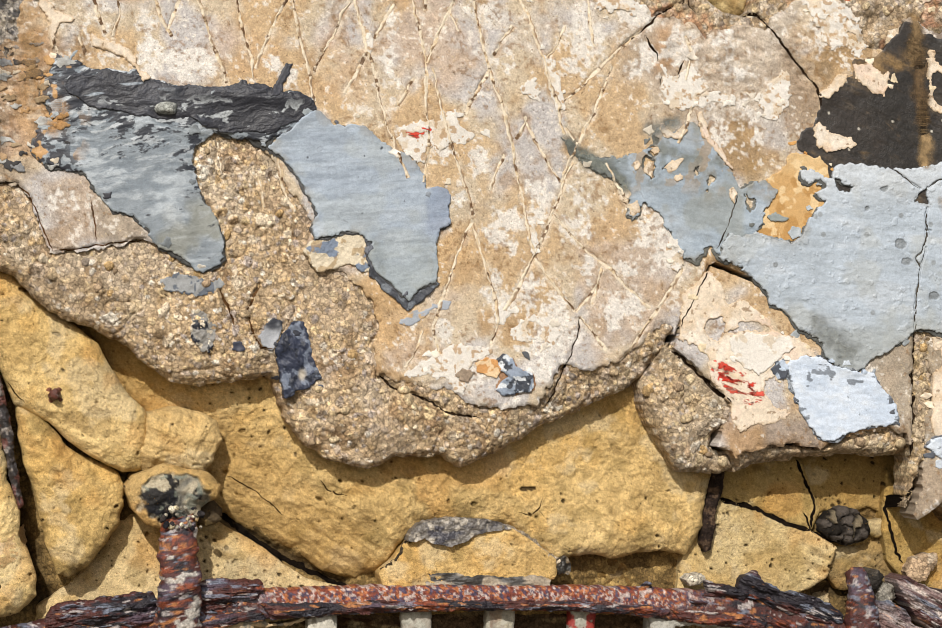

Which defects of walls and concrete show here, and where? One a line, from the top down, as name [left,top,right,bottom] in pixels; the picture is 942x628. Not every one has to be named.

flaking render [0,0,23,45]
peeling [38,0,75,48]
crack [52,0,121,54]
crack [154,0,229,83]
crack [743,13,822,105]
crack [216,142,224,174]
crack [0,181,143,251]
spalling [0,35,673,469]
crack [236,0,738,418]
peeling [592,0,942,508]
crack [220,286,273,349]
crack [720,460,843,544]